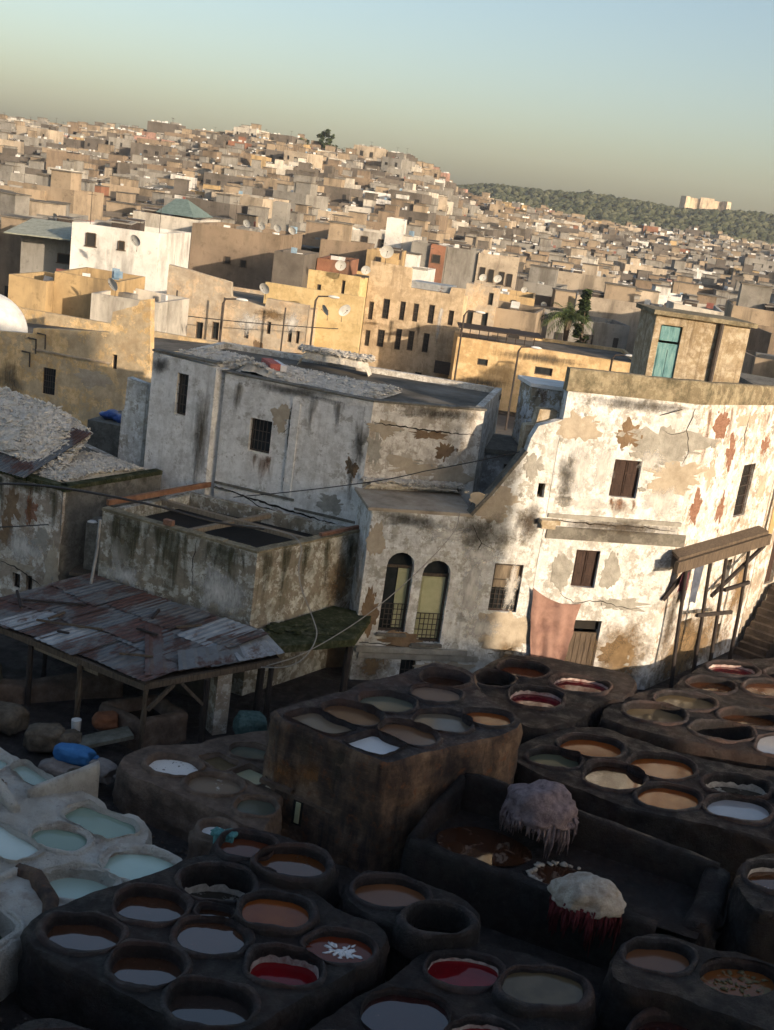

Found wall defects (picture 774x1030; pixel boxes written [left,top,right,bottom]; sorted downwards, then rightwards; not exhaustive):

water stain [194,406,206,472]
flaking render [270,403,291,434]
crack [374,422,473,435]
spalling [760,421,774,457]
flaking render [345,419,545,523]
flaking render [555,407,755,525]
flaking render [0,488,40,550]
flaking render [316,493,344,516]
spalling [714,490,725,533]
water stain [325,538,353,600]
flaking render [597,637,634,666]